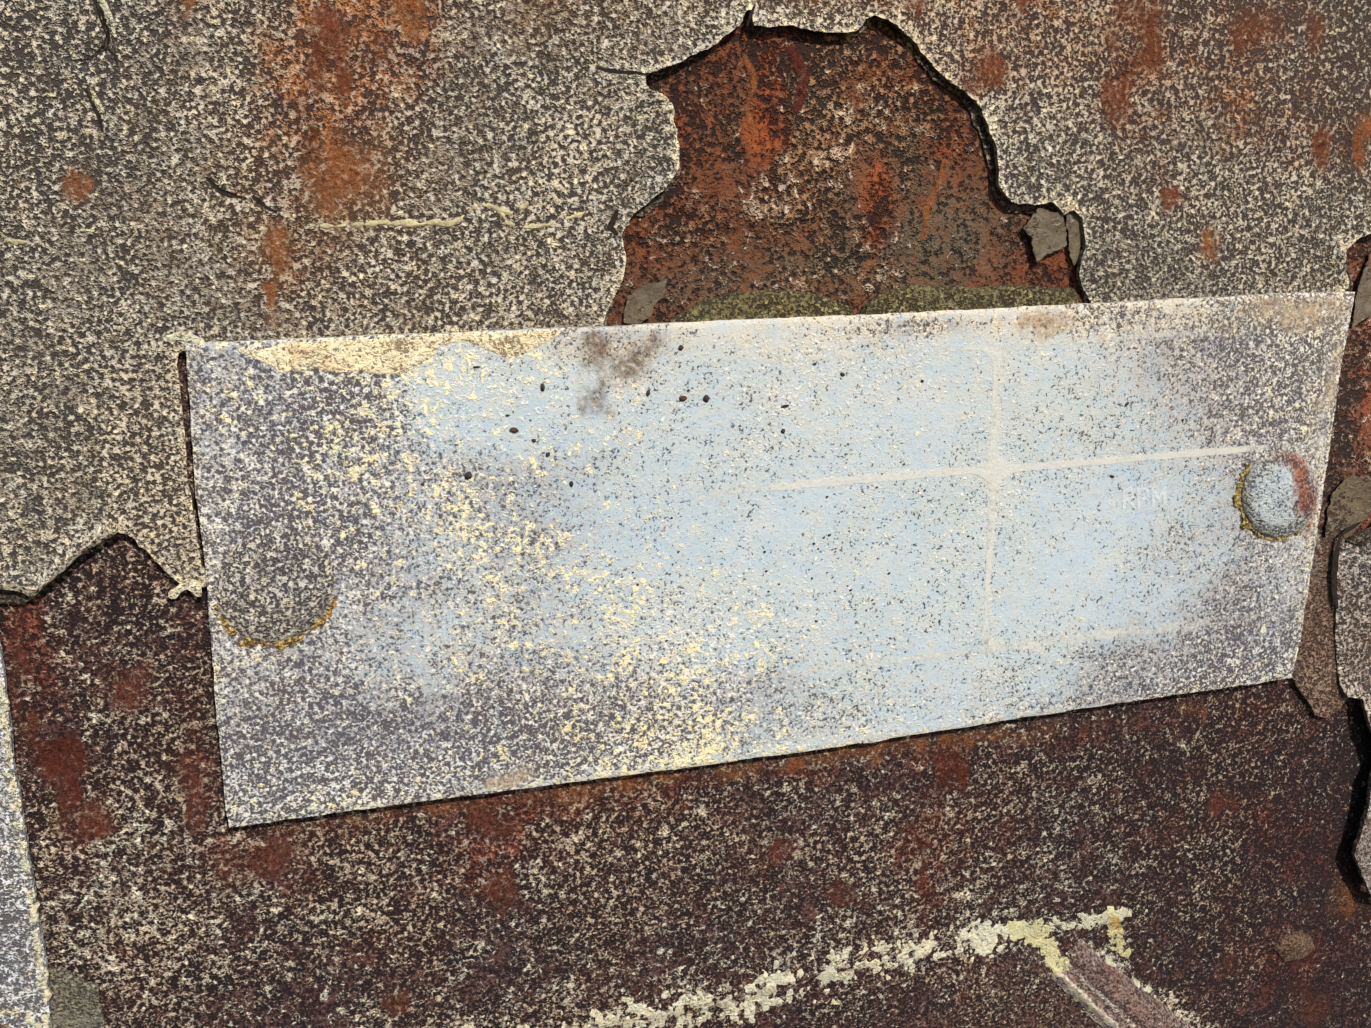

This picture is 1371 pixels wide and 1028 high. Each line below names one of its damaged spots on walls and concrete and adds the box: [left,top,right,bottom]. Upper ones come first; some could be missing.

corrosion [307,8,352,97]
corrosion [965,50,1005,93]
corrosion [1104,0,1163,118]
corrosion [303,106,380,210]
spalling [603,10,1089,326]
corrosion [1161,189,1181,207]
corrosion [1313,128,1329,168]
spalling [1317,234,1371,734]
peeling [0,522,118,604]
peeling [1351,771,1371,896]
peeling [49,966,105,1028]